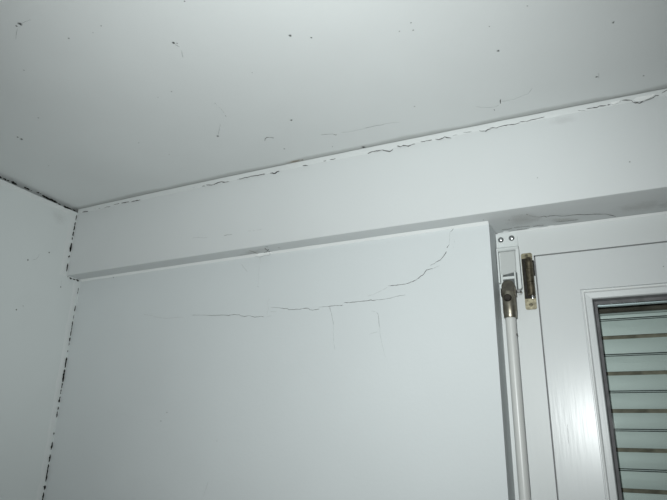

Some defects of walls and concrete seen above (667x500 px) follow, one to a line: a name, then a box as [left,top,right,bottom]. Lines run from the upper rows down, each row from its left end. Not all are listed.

crack [368,117,543,154]
crack [0,176,139,417]
crack [209,239,450,350]
crack [42,433,55,500]